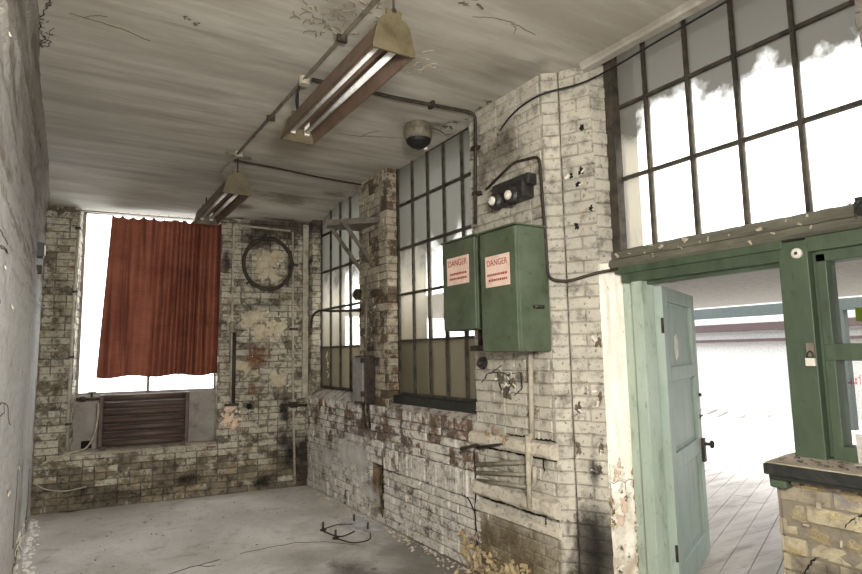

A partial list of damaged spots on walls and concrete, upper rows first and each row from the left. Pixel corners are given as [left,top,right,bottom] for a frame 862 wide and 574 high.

crack [39,0,54,48]
crack [70,13,150,41]
peeling [237,303,288,344]
peeling [236,356,289,388]
peeling [220,396,256,433]
peeling [591,443,640,574]
spalling [457,529,531,574]
damp [588,525,603,565]